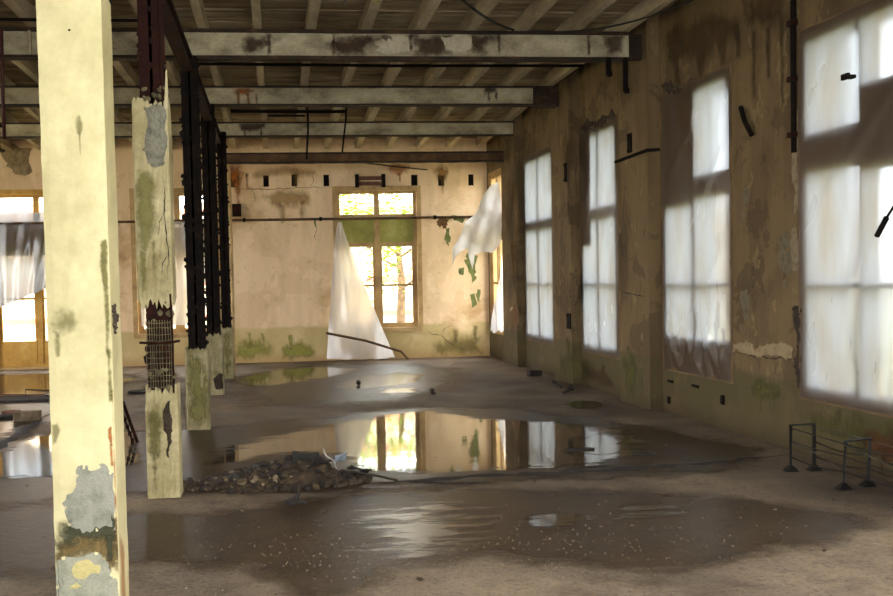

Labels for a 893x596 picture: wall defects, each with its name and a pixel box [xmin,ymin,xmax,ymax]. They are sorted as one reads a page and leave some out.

spalling [142,103,168,168]
peeling [437,215,465,246]
peeling [458,253,481,308]
leakage [437,327,477,353]
spalling [733,305,801,388]
peeling [62,463,117,533]
leakage [0,364,869,596]
peeling [56,552,118,596]